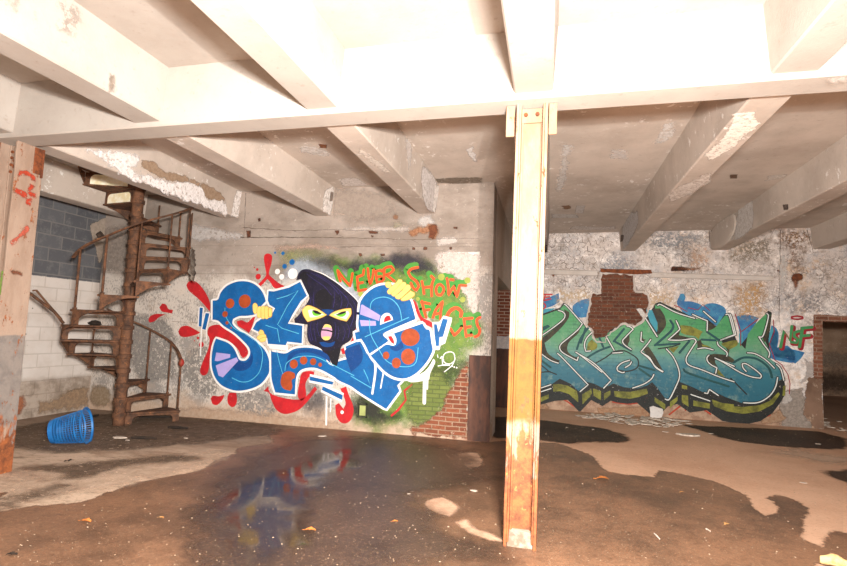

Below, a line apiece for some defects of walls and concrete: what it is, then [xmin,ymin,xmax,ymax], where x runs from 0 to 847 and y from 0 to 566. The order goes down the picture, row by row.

peeling [705,112,761,160]
peeling [86,148,242,217]
peeling [192,225,242,241]
crack [544,233,614,290]
flaking render [585,272,651,343]
crack [642,230,736,303]
crack [776,229,846,322]